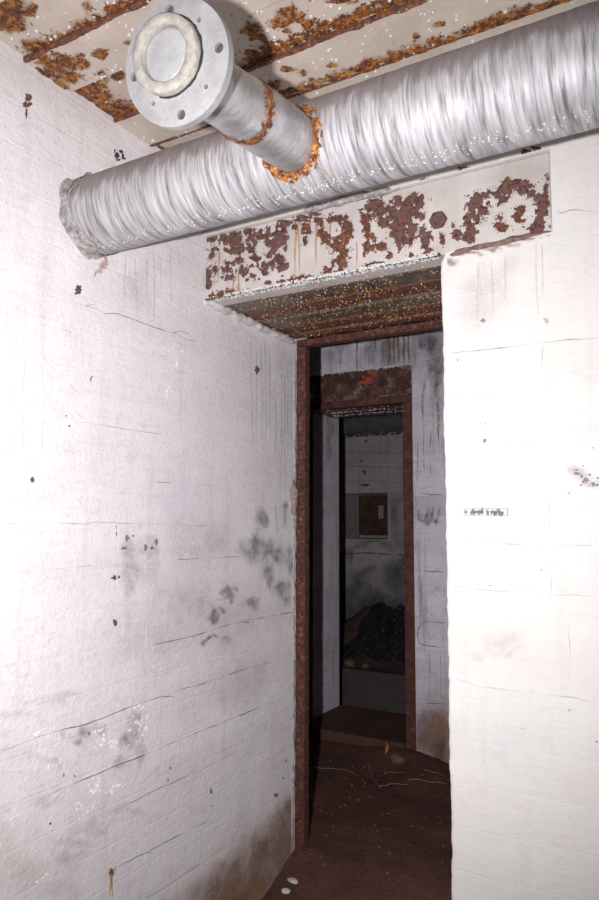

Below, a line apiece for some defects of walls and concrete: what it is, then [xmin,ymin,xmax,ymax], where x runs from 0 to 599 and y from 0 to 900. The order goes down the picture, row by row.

rust [0,0,151,123]
rust [150,0,571,186]
rust [206,173,551,298]
rust [316,334,411,402]